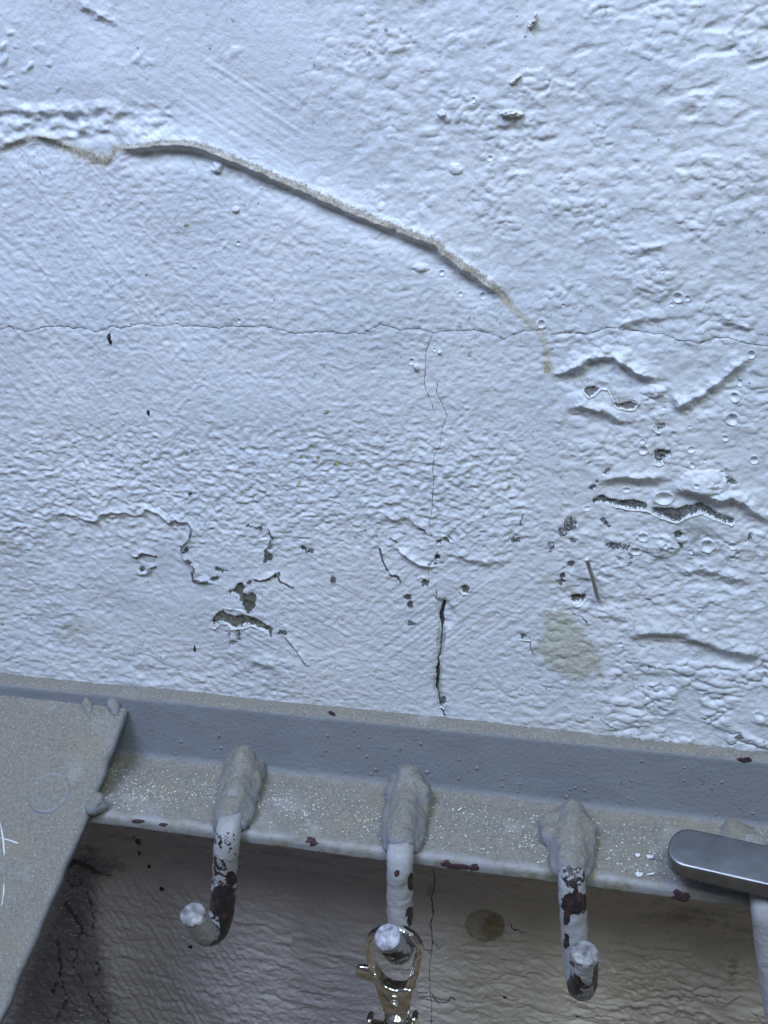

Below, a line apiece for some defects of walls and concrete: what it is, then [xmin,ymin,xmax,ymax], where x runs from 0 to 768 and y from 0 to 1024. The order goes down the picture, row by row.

peeling [582,386,641,412]
peeling [653,449,672,468]
crack [0,323,768,716]
peeling [546,517,580,553]
peeling [604,540,633,566]
peeling [588,462,737,549]
peeling [51,503,311,666]
peeling [569,594,588,608]